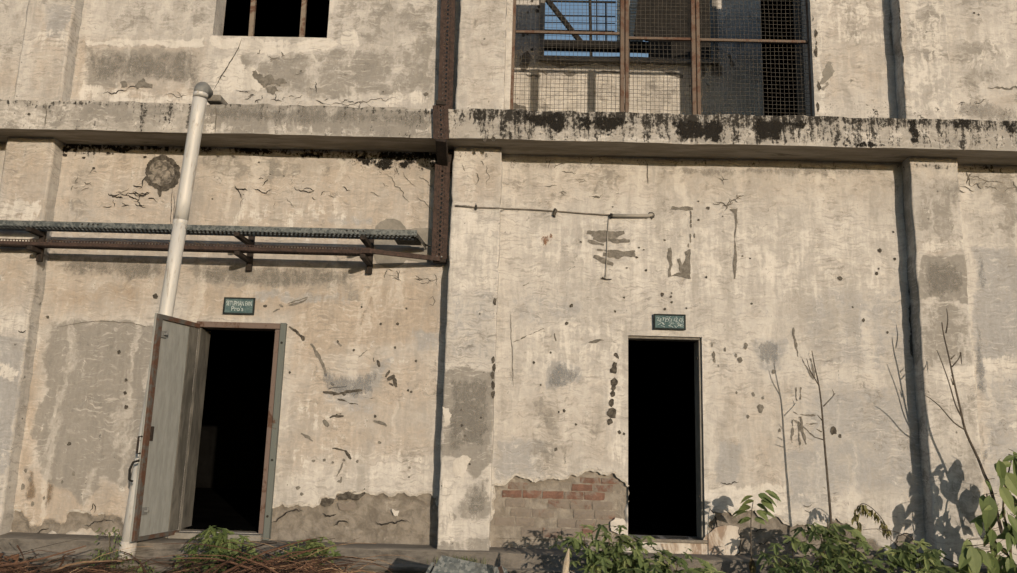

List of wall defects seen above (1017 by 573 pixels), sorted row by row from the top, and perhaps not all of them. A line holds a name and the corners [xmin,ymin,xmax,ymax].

crack [214,39,242,130]
damp [503,111,567,133]
mould [673,119,723,142]
damp [63,144,183,159]
mould [235,148,323,158]
mould [356,152,437,170]
spalling [580,230,645,269]
peeling [664,195,751,279]
flaking render [11,496,123,536]
flaking render [271,448,438,545]
flaking render [490,469,630,551]
flaking render [661,508,915,559]